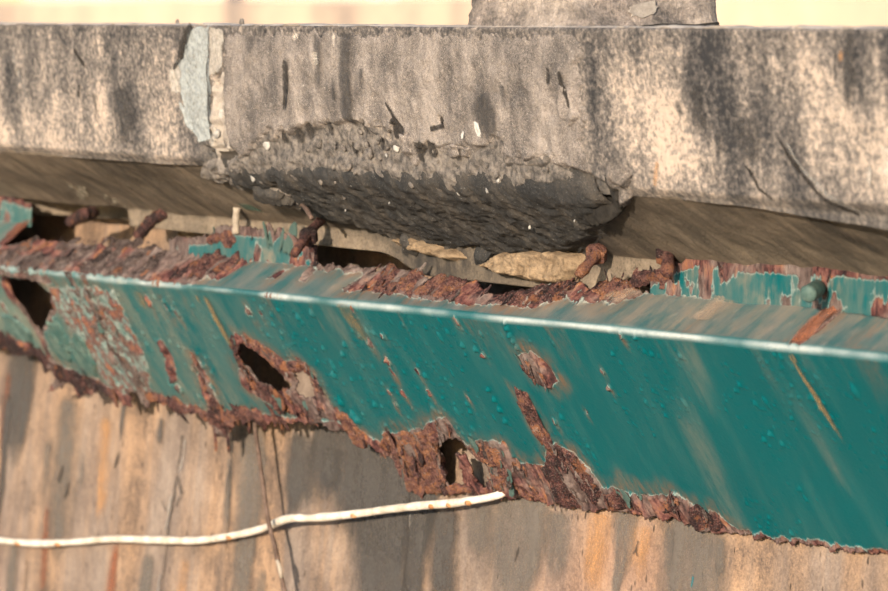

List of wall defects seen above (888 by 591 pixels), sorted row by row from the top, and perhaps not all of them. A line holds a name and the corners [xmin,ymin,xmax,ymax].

spalling [169,24,574,211]
peeling [556,84,581,127]
corrosion [0,220,323,452]
spalling [391,238,467,261]
corrosion [480,277,578,307]
spalling [479,250,586,284]
leakage [0,354,35,505]
leakage [224,428,265,591]
leakage [286,423,458,591]
corrosion [378,418,476,509]
leakage [470,497,566,591]
corrosion [468,354,642,512]